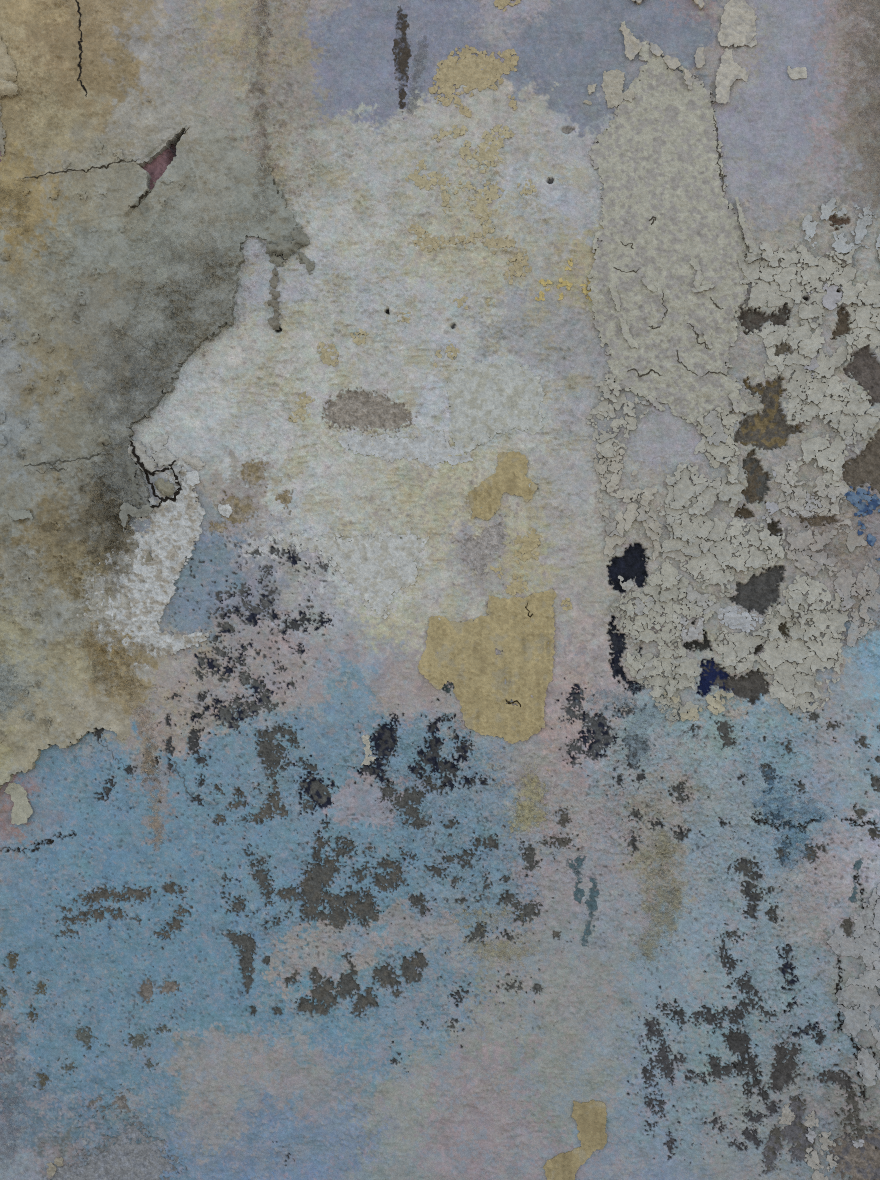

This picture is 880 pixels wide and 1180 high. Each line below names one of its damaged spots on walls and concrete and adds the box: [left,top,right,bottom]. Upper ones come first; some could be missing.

crack [23,159,136,179]
crack [128,191,151,208]
peeling [558,0,880,785]
crack [24,453,101,474]
crack [130,441,183,518]
peeling [0,0,508,929]
peeling [56,882,193,949]
peeling [456,876,543,946]
peeling [728,857,778,923]
peeling [225,930,270,993]
peeling [285,951,428,1016]
peeling [642,883,880,1180]